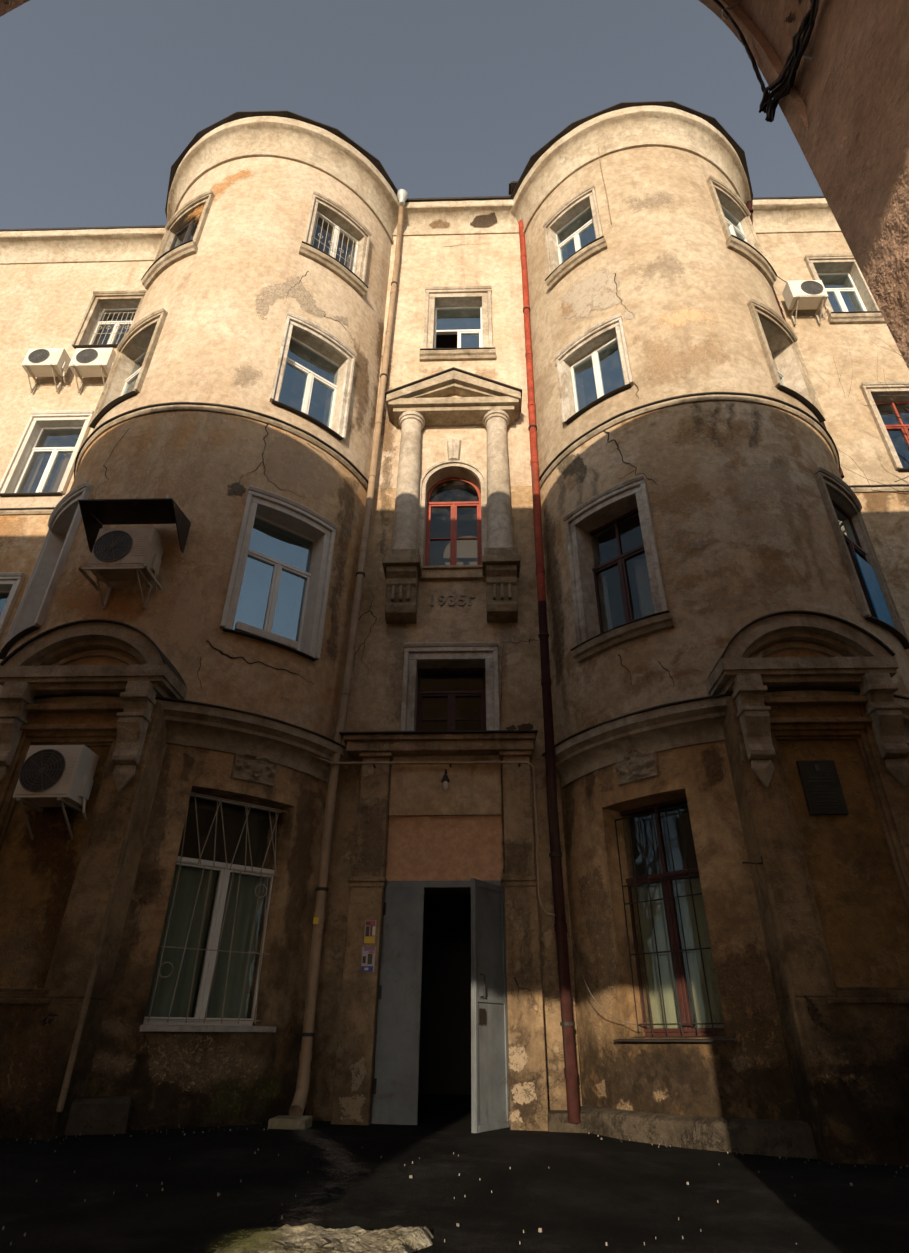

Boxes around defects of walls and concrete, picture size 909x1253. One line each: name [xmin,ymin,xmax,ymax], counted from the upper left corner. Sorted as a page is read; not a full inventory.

peeling [470,212,497,227]
flaking render [255,277,348,326]
flaking render [562,268,635,319]
crack [239,424,306,498]
crack [604,430,658,485]
crack [197,640,313,689]
damp [285,790,315,952]
spalling [338,1057,368,1125]
spalling [508,1045,537,1125]
damp [596,1042,752,1114]